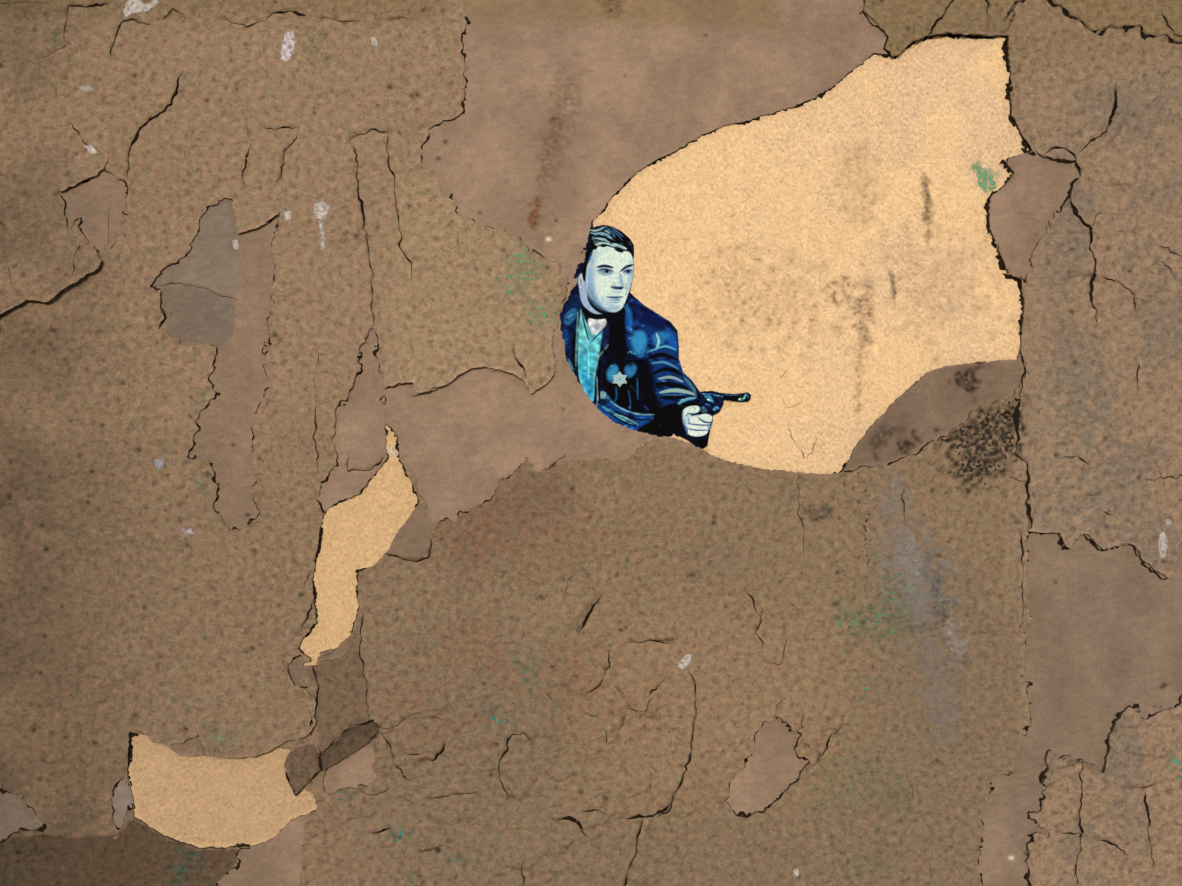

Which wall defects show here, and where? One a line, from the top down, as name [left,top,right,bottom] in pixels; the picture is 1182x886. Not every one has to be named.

peeling [122,0,159,20]
peeling [279,31,297,62]
crack [985,0,1182,44]
crack [349,128,412,319]
peeling [421,0,1081,474]
crack [1036,84,1136,324]
peeling [150,196,291,530]
crack [284,613,531,799]
peeling [112,305,707,886]
crack [554,640,697,886]
crack [1008,350,1033,628]
peeling [976,503,1182,886]